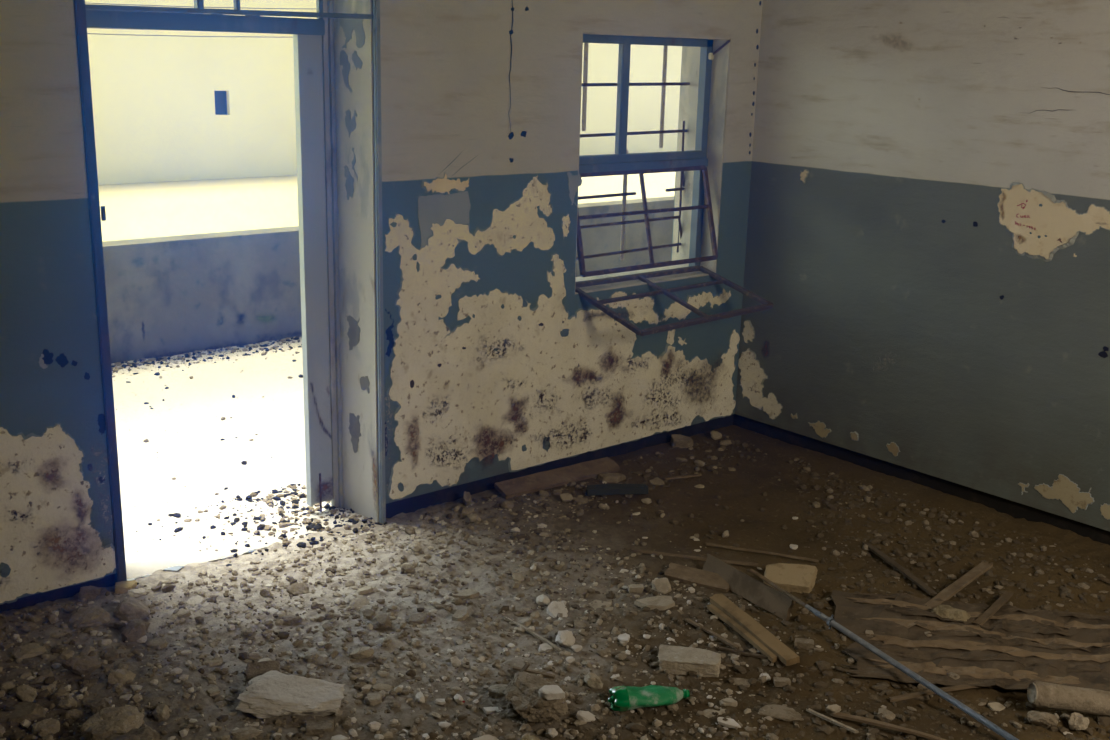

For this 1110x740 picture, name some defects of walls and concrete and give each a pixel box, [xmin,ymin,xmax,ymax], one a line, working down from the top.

peeling [997,182,1110,262]
peeling [346,315,361,350]
damp [477,338,523,359]
peeling [384,172,831,500]
peeling [359,376,370,394]
damp [661,361,719,403]
peeling [348,413,361,453]
damp [430,439,465,468]
damp [535,429,588,447]
peeling [0,423,116,605]
peeling [1018,474,1110,520]